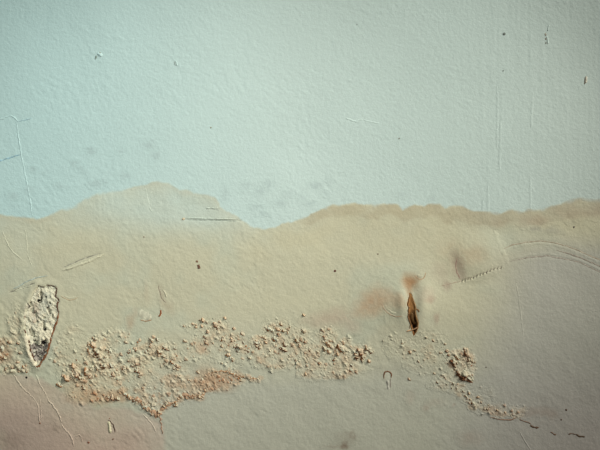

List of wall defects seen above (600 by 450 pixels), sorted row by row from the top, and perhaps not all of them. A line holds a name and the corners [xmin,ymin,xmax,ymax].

flaking render [0,285,530,434]
leakage [0,171,600,450]
rust [344,269,423,323]